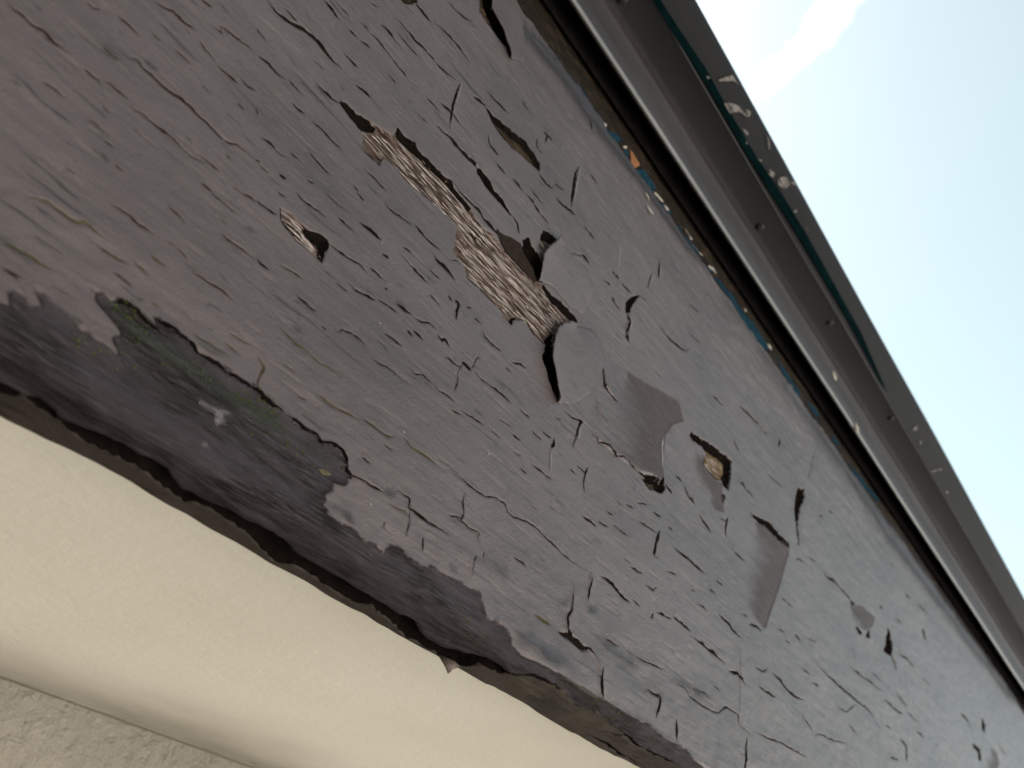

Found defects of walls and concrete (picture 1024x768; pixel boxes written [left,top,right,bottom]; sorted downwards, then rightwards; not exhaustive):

peeling [280,208,329,262]
crack [2,0,662,487]
peeling [0,291,703,768]
peeling [341,101,605,406]
crack [299,391,929,768]
crack [664,302,700,351]
peeling [477,0,1024,713]